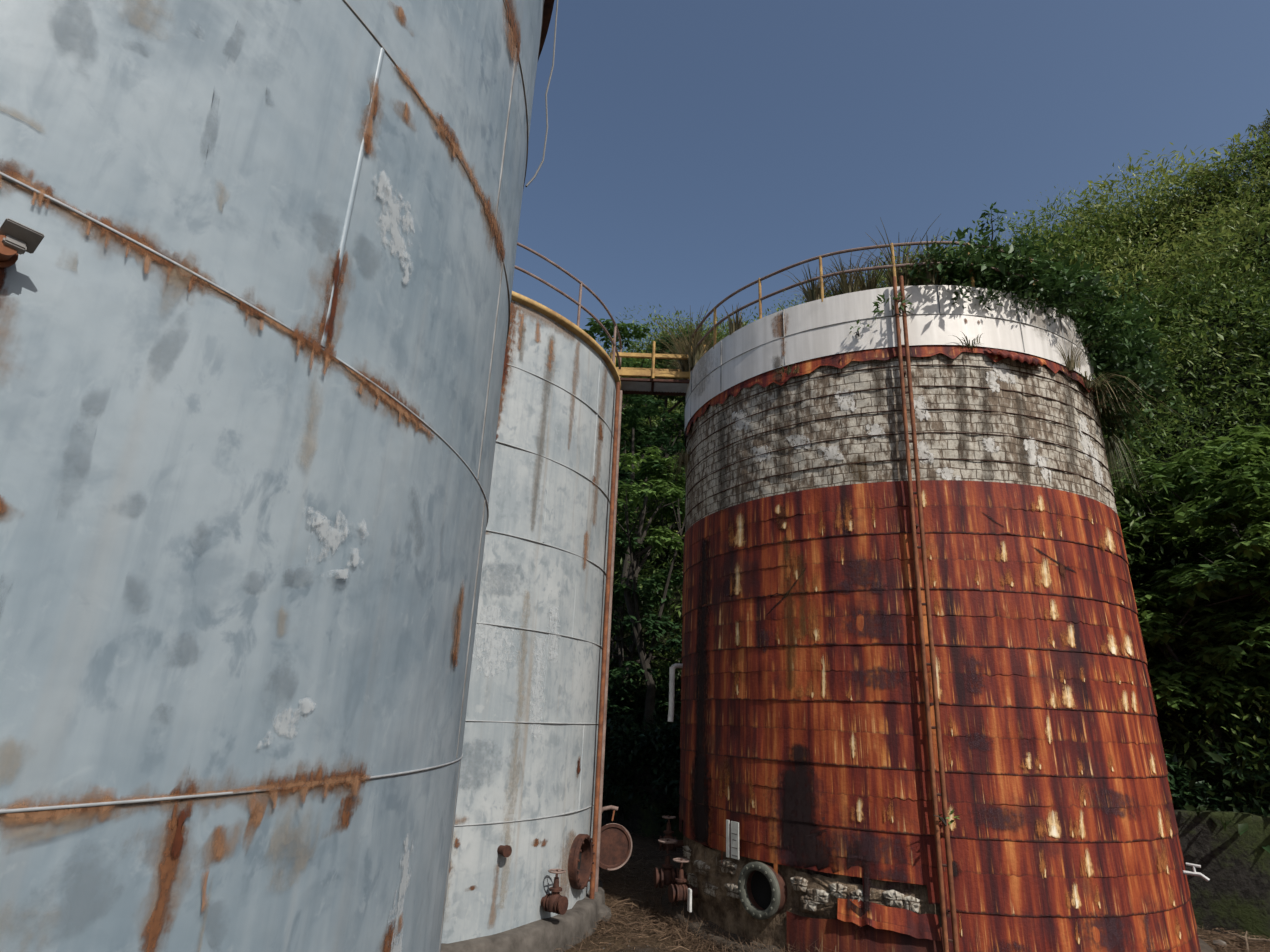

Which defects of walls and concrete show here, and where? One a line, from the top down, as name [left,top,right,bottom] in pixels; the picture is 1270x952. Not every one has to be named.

corrosion [397,66,505,259]
peeling [378,171,413,283]
corrosion [0,165,434,437]
corrosion [498,302,580,440]
damp [775,357,801,479]
damp [957,367,969,462]
damp [980,369,992,479]
damp [1066,376,1077,470]
peeling [309,510,366,553]
corrosion [0,766,369,952]
peeling [682,846,740,899]
peeling [790,876,920,913]